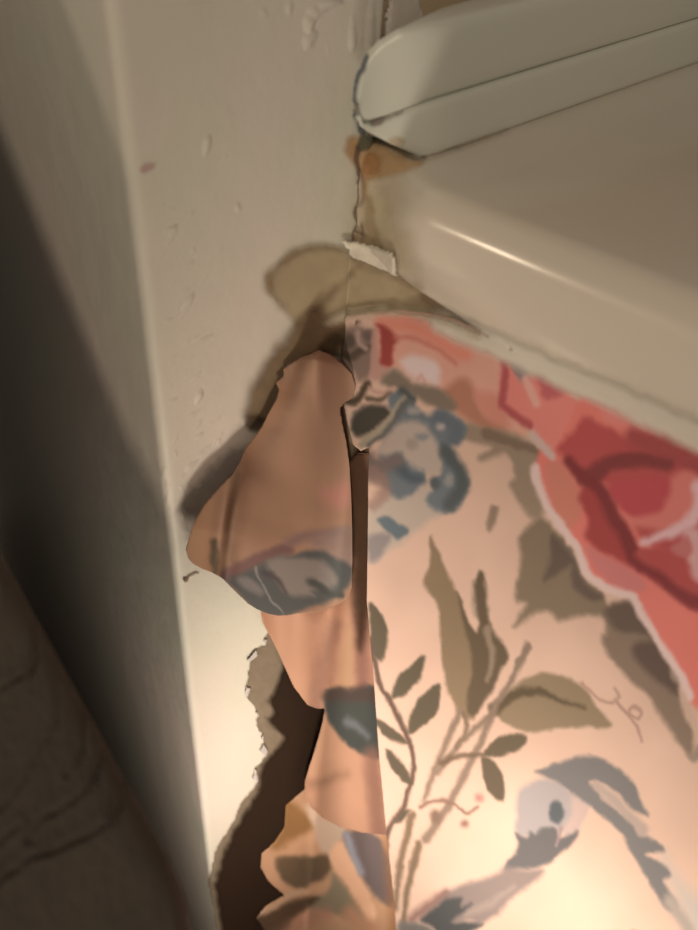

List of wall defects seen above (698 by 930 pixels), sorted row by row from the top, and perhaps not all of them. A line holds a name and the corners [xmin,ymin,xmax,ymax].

crack [352,54,501,241]
damp [246,248,441,432]
peeling [341,239,399,276]
flaking render [209,634,325,930]